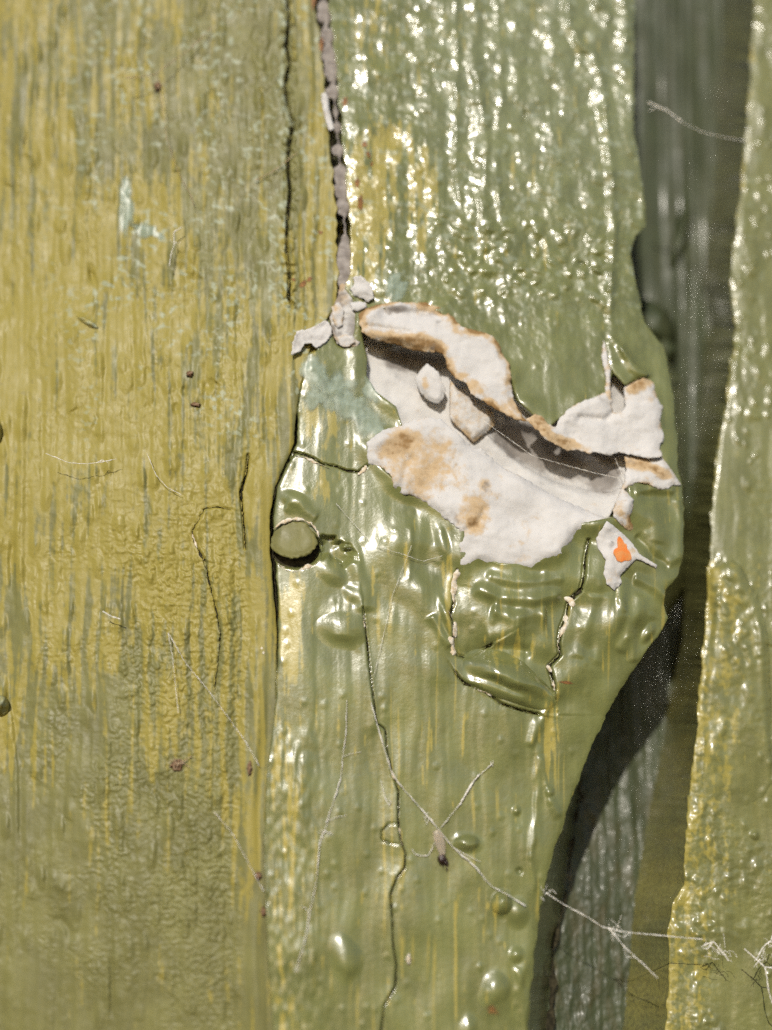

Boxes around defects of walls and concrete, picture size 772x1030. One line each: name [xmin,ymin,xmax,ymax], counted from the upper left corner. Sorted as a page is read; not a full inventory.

crack [281,0,293,305]
crack [316,0,351,287]
crack [192,425,368,691]
peeling [291,275,681,590]
crack [447,570,536,714]
crack [546,540,589,691]
crack [363,615,406,1030]